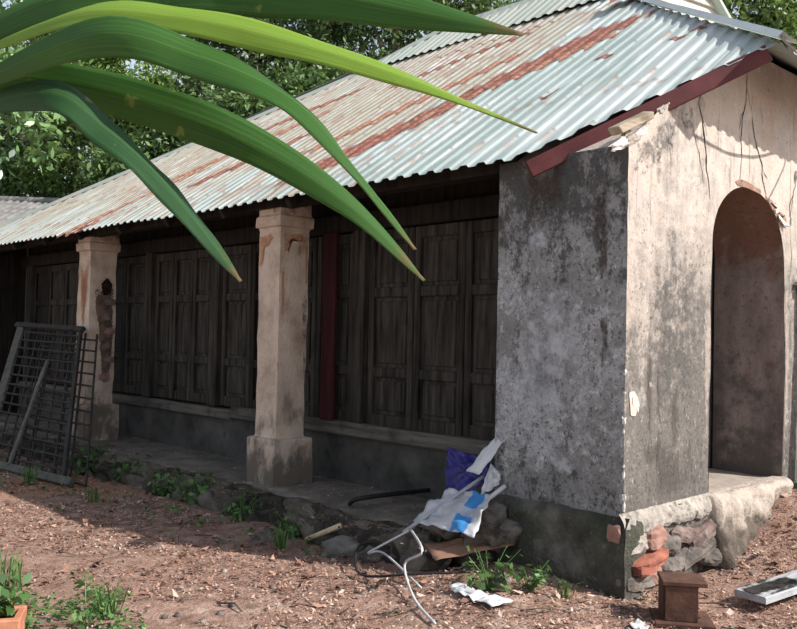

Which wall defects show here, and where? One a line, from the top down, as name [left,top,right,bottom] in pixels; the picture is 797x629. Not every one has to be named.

corrosion [57,192,152,238]
corrosion [171,155,244,188]
corrosion [310,87,364,118]
corrosion [334,9,657,157]
leakage [595,188,607,273]
crack [693,96,710,193]
crack [740,90,768,193]
spalling [736,179,790,228]
crack [789,171,797,261]
spalling [95,278,116,382]
leakage [510,292,578,427]
spalling [622,391,639,446]